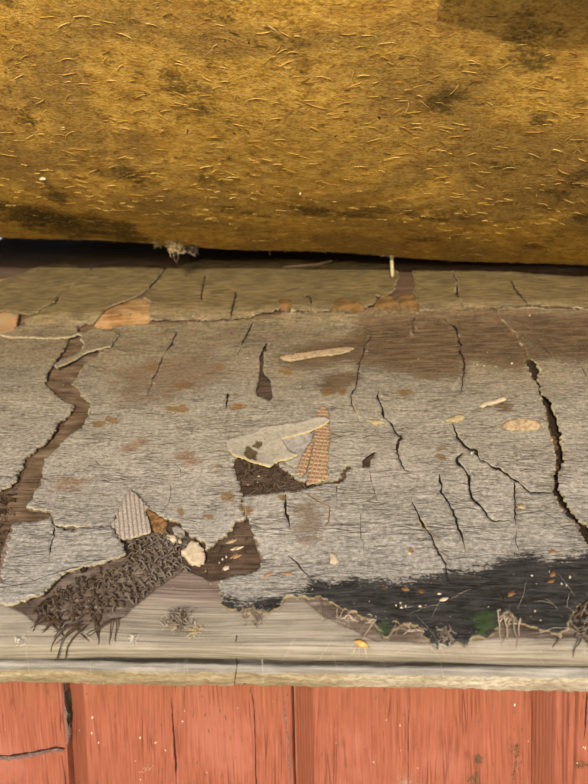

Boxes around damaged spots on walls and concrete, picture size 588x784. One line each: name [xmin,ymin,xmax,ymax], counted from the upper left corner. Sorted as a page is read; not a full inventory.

peeling [256,345,272,401]
peeling [0,299,261,630]
peeling [227,416,351,496]
crack [85,293,588,615]
crack [1,518,129,604]
peeling [305,597,430,643]
peeling [473,604,588,641]
crack [0,746,66,784]
leakage [467,754,483,784]